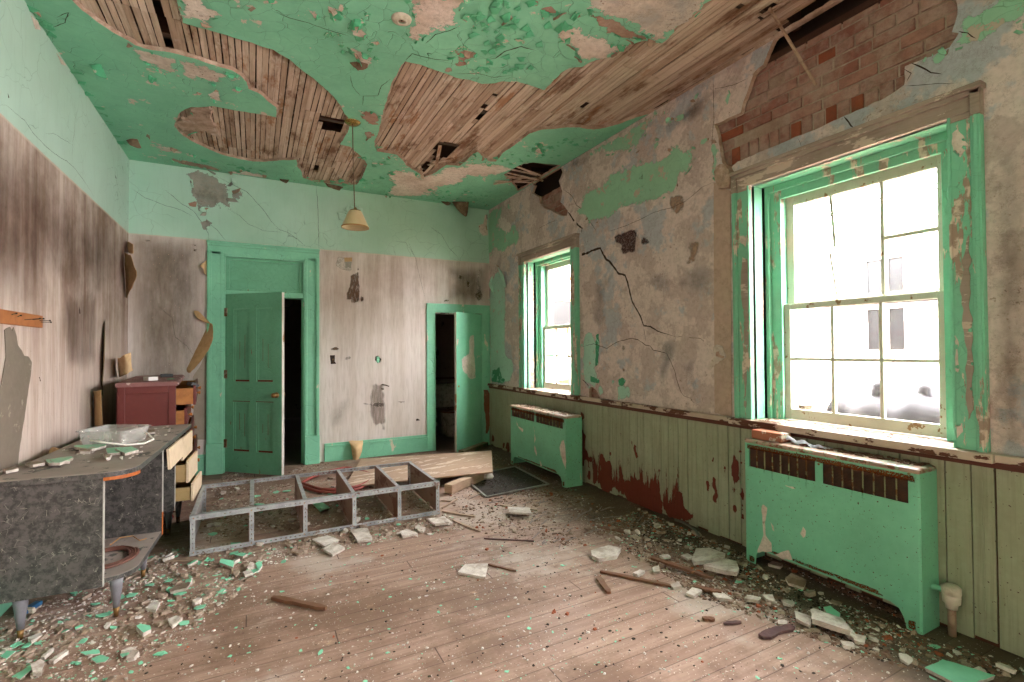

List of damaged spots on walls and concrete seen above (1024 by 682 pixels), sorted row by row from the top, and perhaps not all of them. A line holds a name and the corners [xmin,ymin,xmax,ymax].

peeling [126,109,367,230]
flaking render [336,0,1024,223]
crack [537,161,714,406]
peeling [952,235,974,441]
peeling [581,412,693,521]